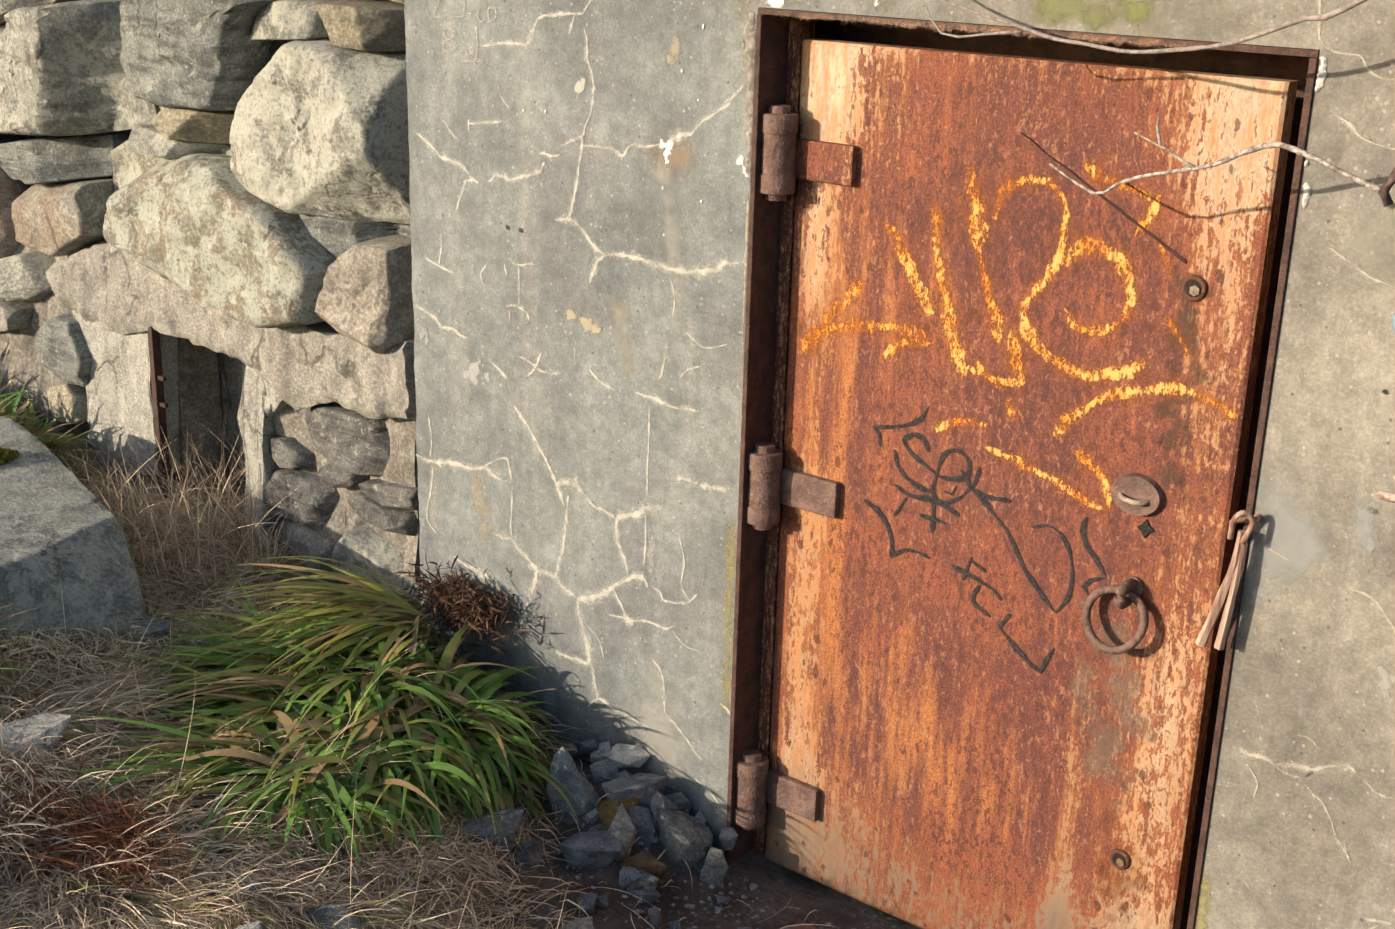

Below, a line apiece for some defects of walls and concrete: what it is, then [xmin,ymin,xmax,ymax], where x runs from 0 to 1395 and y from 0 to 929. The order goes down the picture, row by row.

crack [415,0,745,804]
water stain [768,0,801,8]